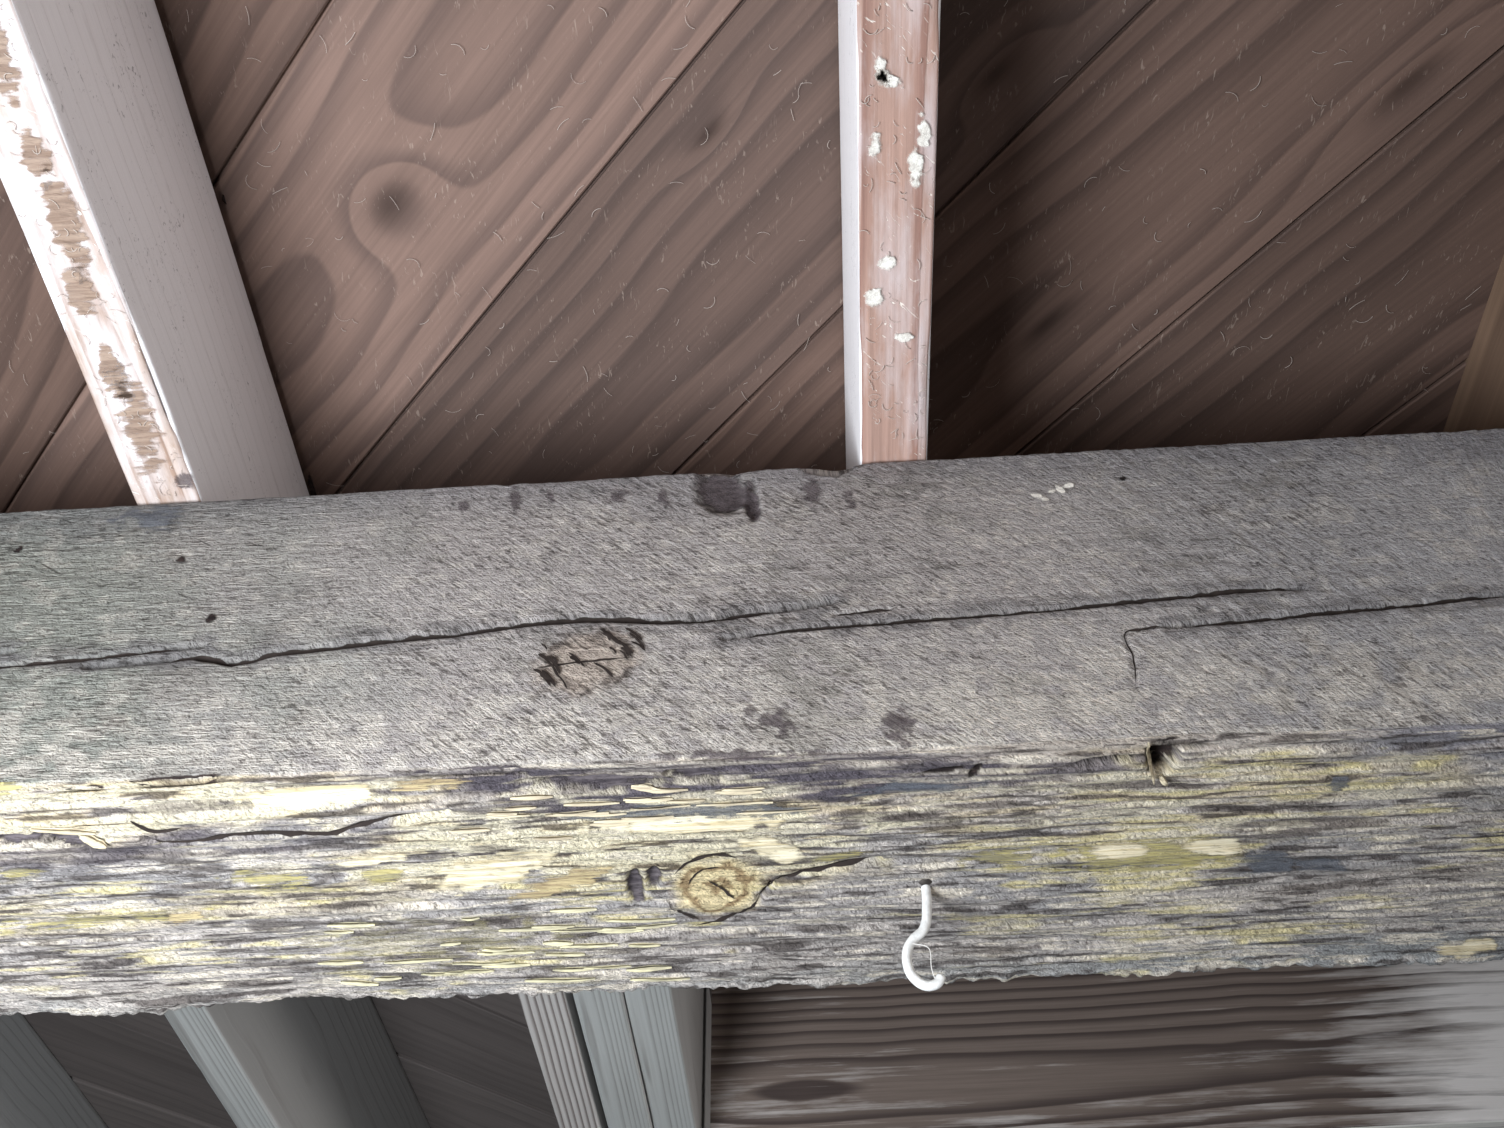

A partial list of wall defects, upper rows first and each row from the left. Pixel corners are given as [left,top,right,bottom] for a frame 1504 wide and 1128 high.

peeling [0,30,21,108]
peeling [19,129,99,315]
peeling [98,344,165,475]
peeling [175,474,192,488]
crack [0,588,1500,688]
water stain [658,706,825,760]
water stain [881,711,917,747]
water stain [854,779,986,796]
water stain [568,803,811,823]
water stain [957,838,1346,876]
water stain [215,870,312,890]
water stain [0,907,214,934]